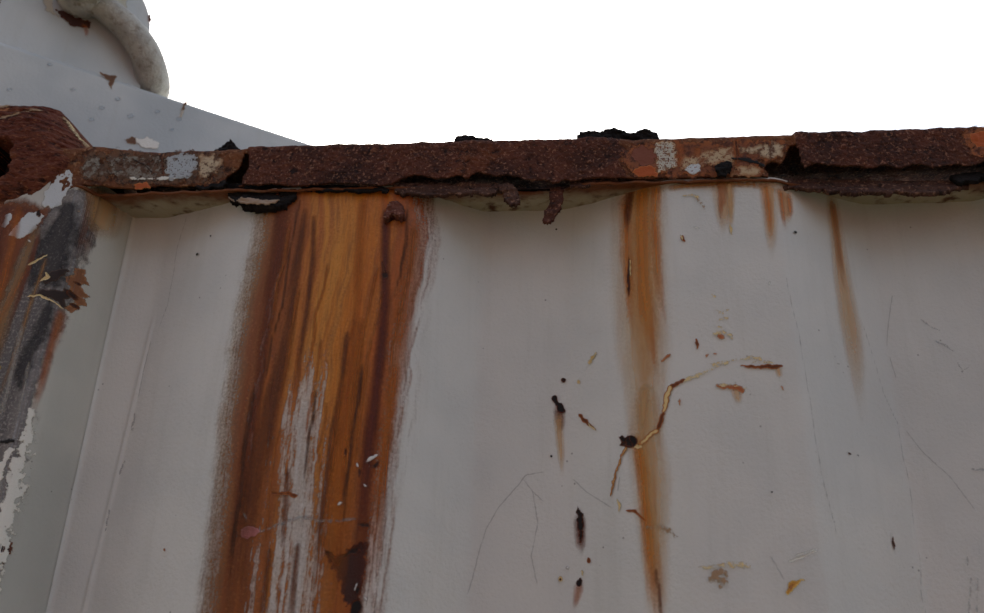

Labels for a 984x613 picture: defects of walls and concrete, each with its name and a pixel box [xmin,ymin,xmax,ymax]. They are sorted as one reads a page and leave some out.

peeling [0,408,37,592]
rust [0,200,51,374]
rust [40,314,63,385]
peeling [4,136,226,242]
rust [214,139,244,161]
rust [194,180,521,613]
rust [542,178,620,225]
rust [577,127,659,141]
rust [623,187,661,608]
crack [610,368,713,511]
rust [673,161,984,346]